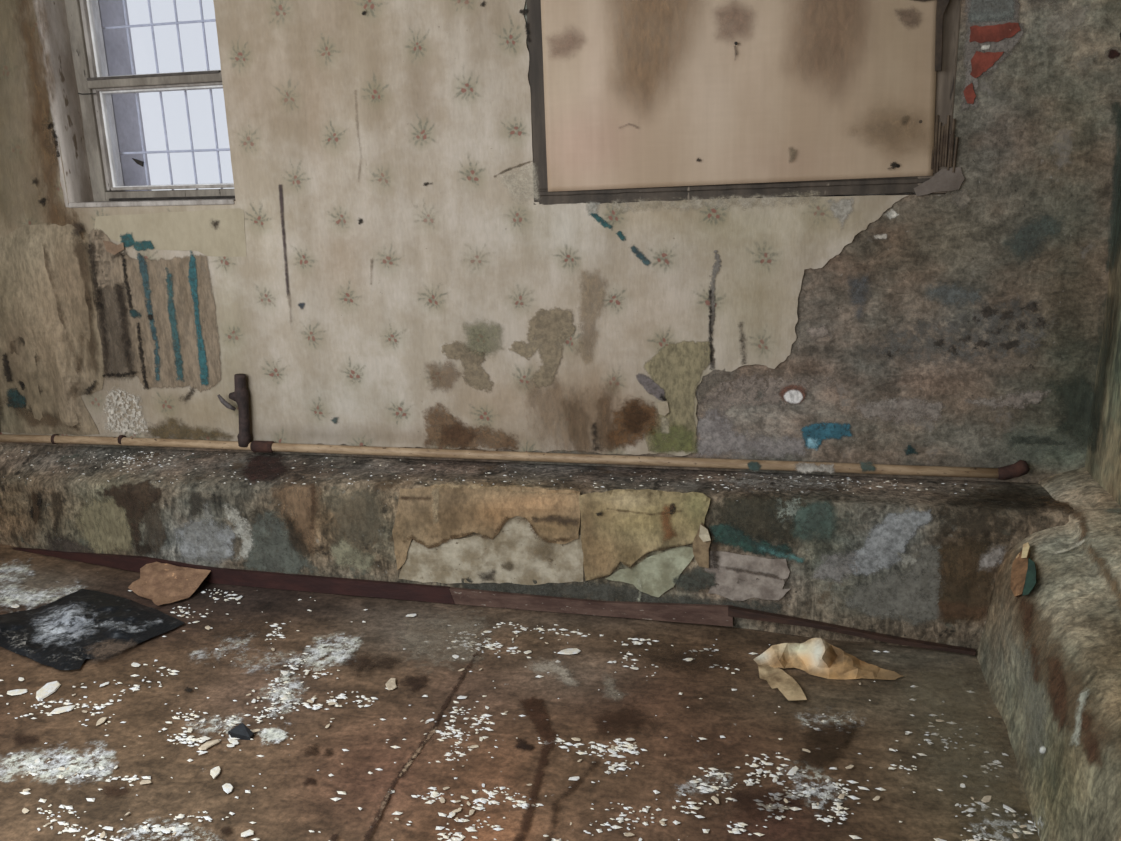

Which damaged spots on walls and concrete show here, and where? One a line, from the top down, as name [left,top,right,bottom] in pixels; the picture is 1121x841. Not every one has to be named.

spalling [961,0,1024,109]
peeling [119,233,154,251]
flaking render [587,193,853,223]
leakage [429,273,613,451]
spalling [872,300,1046,370]
flaking render [695,369,830,458]
flaking render [857,398,943,425]
flaking render [964,390,1050,408]
peeling [704,542,790,601]
crack [364,637,487,841]